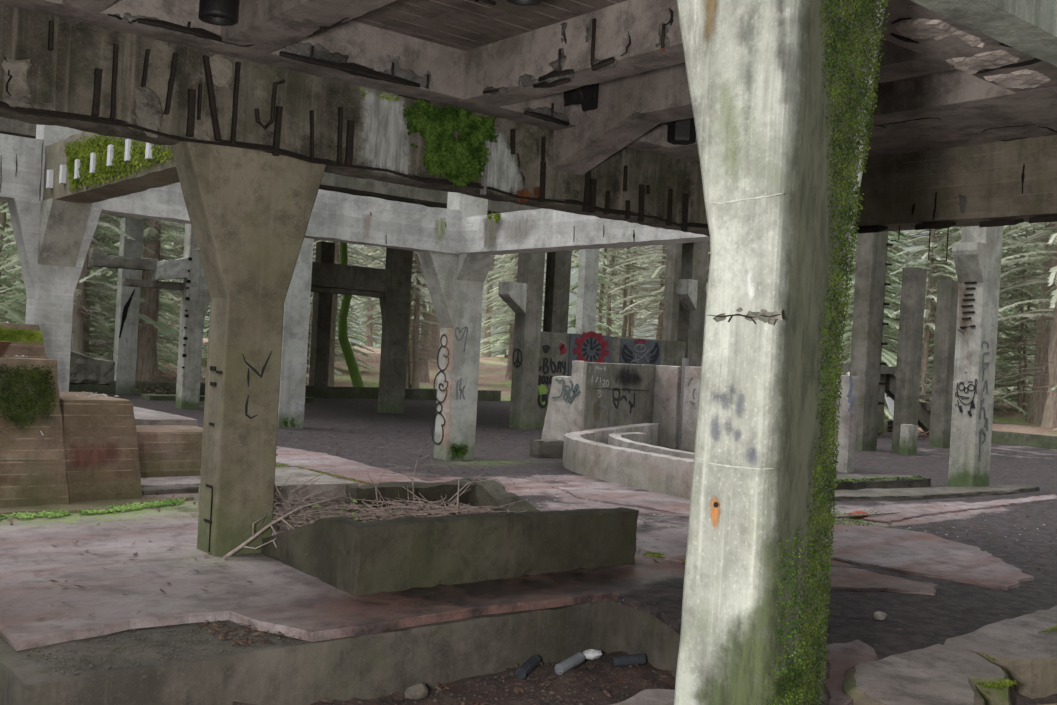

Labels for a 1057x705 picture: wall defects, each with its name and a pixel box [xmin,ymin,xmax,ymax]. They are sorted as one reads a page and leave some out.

spalling [114,12,235,88]
spalling [279,42,431,90]
spalling [482,23,575,98]
spalling [585,18,618,71]
spalling [655,22,671,48]
crack [891,18,919,44]
crack [976,43,1042,74]
spalling [0,59,709,229]
crack [709,314,781,324]
corrosion [711,498,719,526]